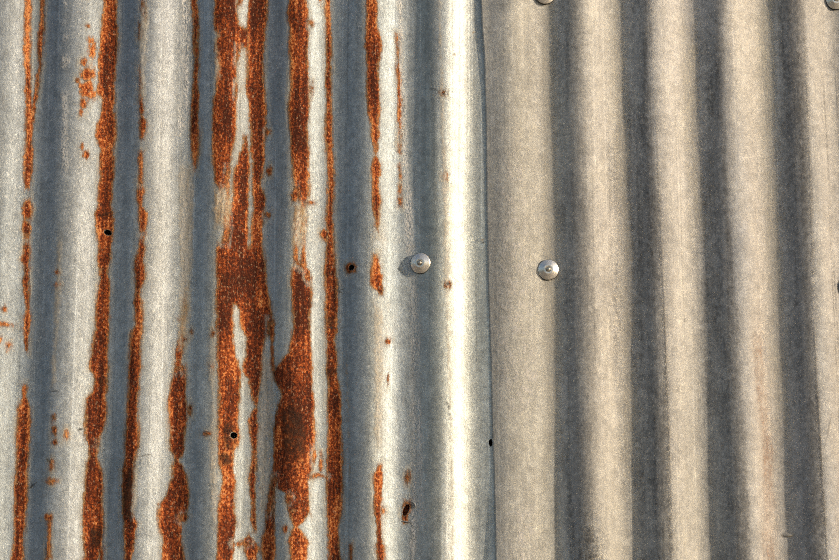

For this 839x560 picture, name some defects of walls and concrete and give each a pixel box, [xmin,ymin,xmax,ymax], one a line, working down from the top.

rust [10,384,32,560]
rust [21,0,45,351]
rust [44,514,53,560]
rust [62,0,119,560]
rust [121,150,148,560]
rust [138,0,148,139]
rust [156,0,201,560]
rust [203,0,357,560]
rust [364,0,383,233]
rust [370,250,384,295]
rust [371,463,386,560]
rust [394,0,414,267]